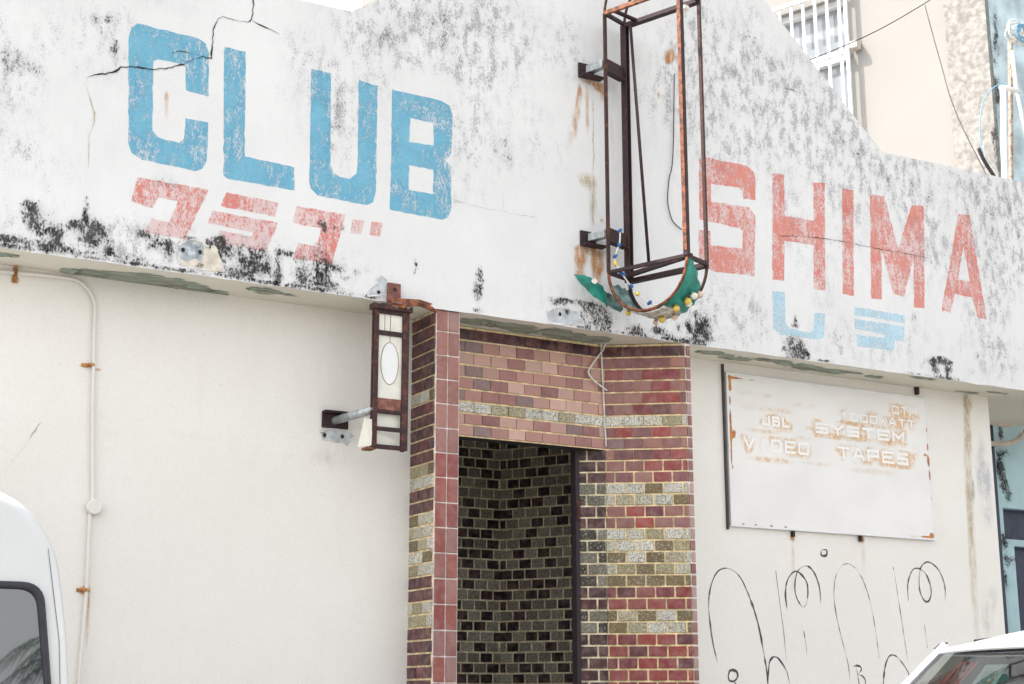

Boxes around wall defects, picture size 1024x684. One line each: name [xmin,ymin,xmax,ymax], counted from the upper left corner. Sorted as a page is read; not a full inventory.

crack [86,0,277,168]
peeling [59,238,228,296]
leakage [0,196,360,295]
corrosion [576,247,603,275]
leakage [550,297,715,346]
leakage [782,319,829,362]
leakage [927,356,959,380]